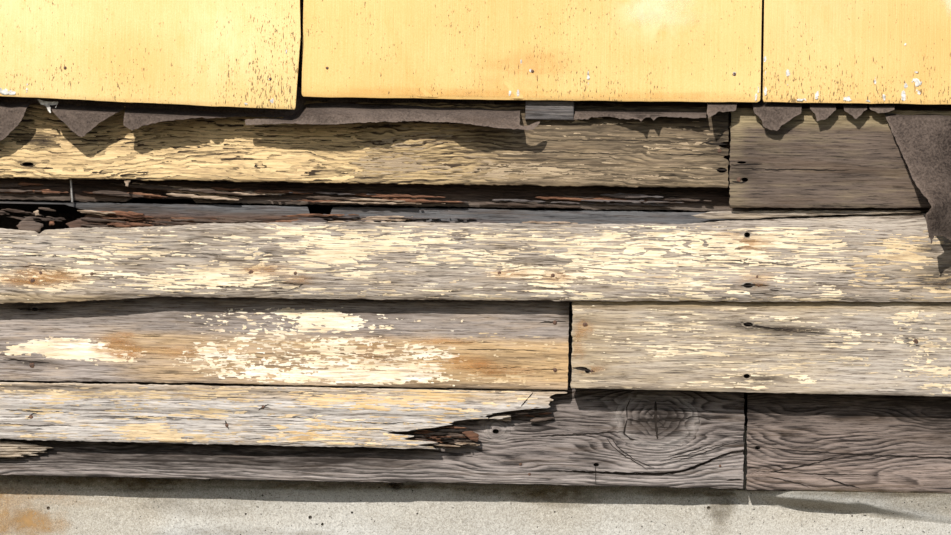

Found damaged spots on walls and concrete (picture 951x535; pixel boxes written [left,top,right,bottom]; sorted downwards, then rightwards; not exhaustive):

peeling [0,105,721,186]
peeling [0,224,951,447]